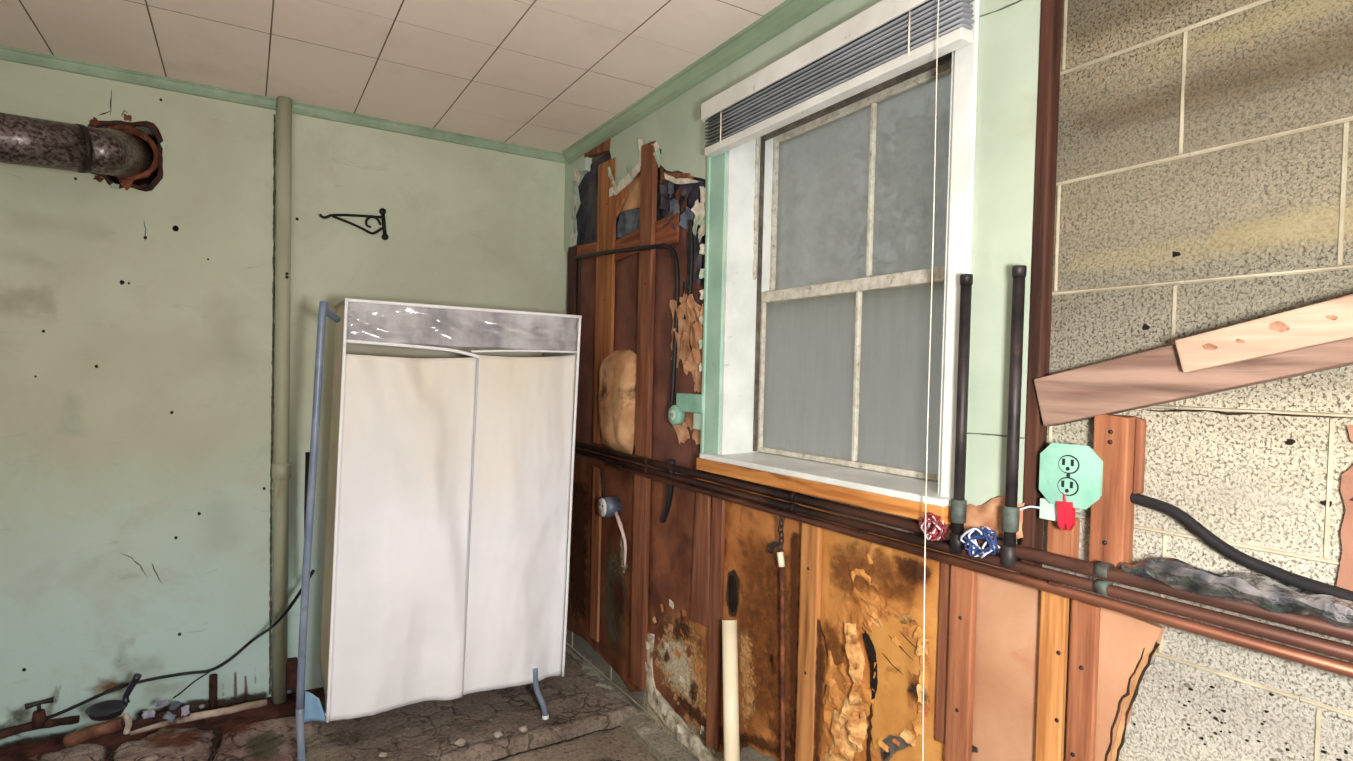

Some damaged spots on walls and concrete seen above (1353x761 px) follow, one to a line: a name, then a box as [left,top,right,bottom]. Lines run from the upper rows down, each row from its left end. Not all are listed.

flaking render [571,168,580,245]
flaking render [608,139,707,372]
crack [105,750,117,761]
crack [207,727,222,761]
peeling [645,599,719,761]
leakage [642,532,799,761]
peeling [819,680,868,761]